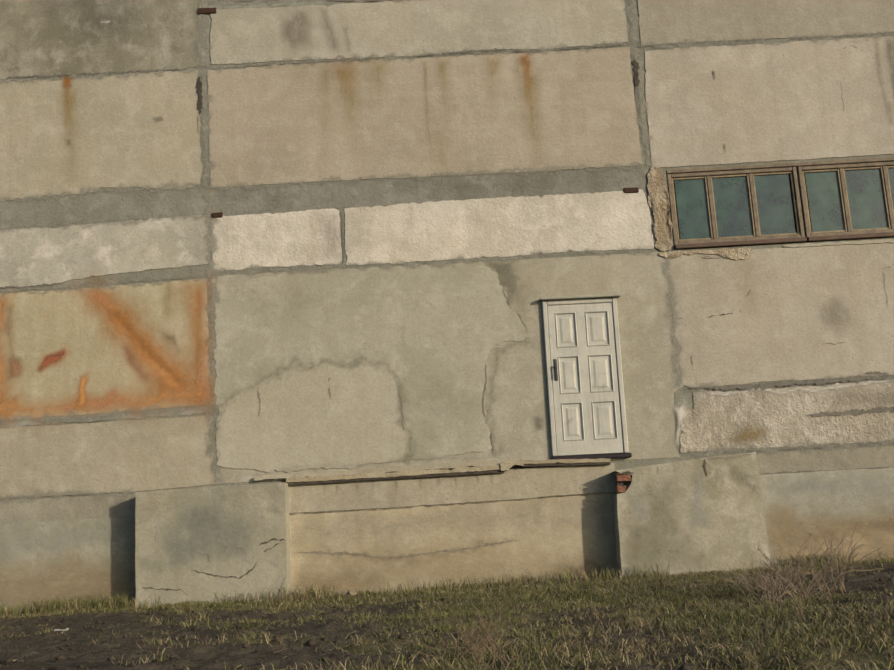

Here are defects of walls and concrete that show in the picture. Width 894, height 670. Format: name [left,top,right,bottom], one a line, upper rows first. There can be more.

spalling [647,167,755,260]
rust [63,292,207,409]
crack [807,407,894,417]
crack [192,538,518,579]
crack [143,587,187,595]